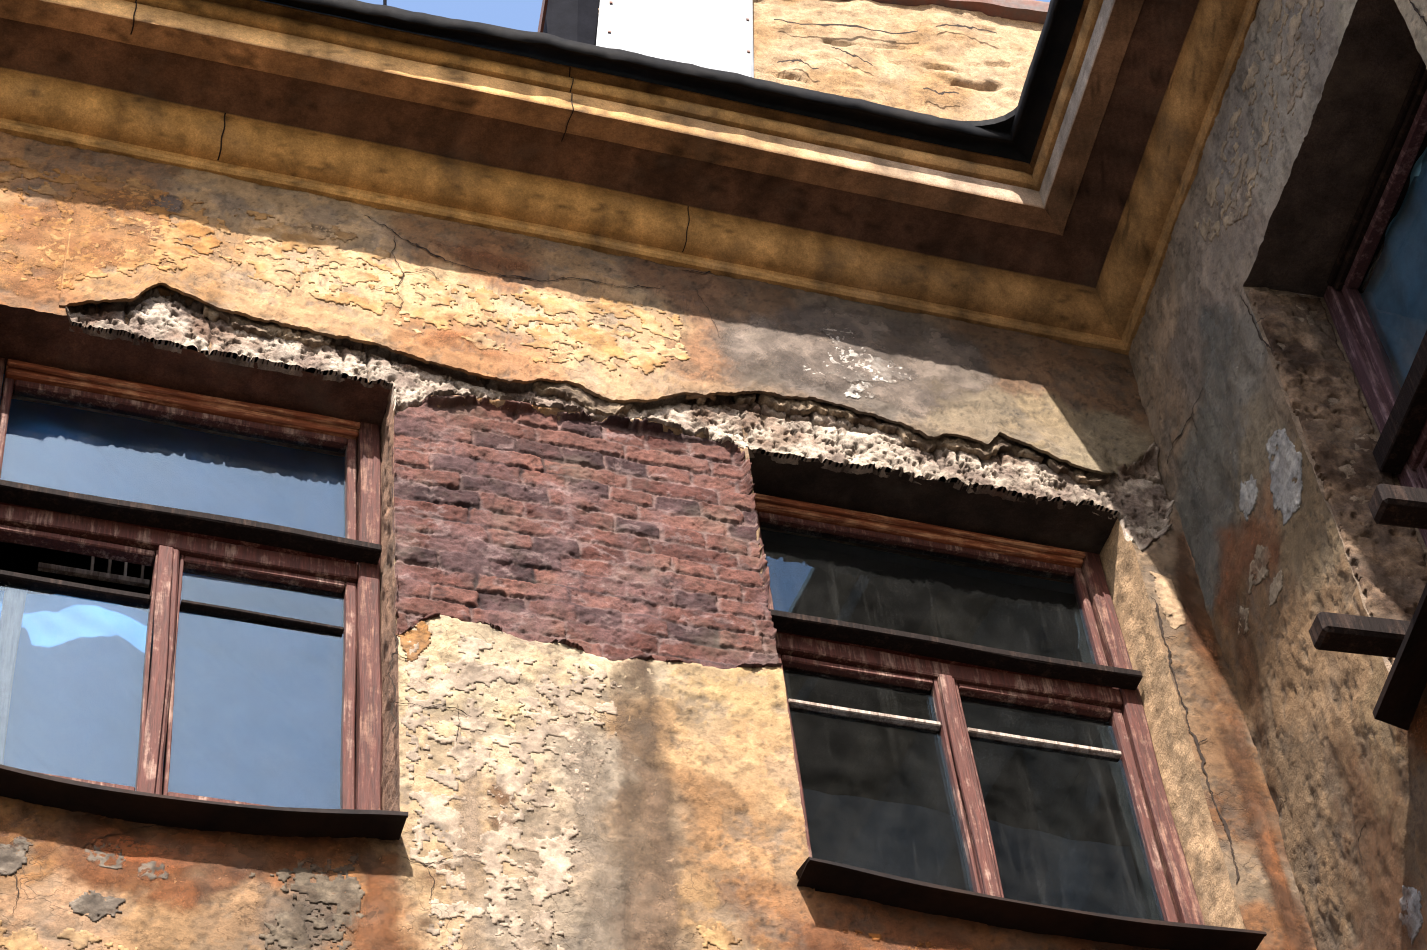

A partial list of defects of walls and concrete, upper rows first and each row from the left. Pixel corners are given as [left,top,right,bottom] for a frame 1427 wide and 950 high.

crack [774,19,997,69]
crack [923,87,959,95]
spalling [1239,288,1427,621]
flaking render [0,156,1174,950]
peeling [1149,571,1186,630]
peeling [1236,544,1283,639]
water stain [424,775,481,887]
water stain [566,658,679,950]
peeling [1398,885,1423,946]